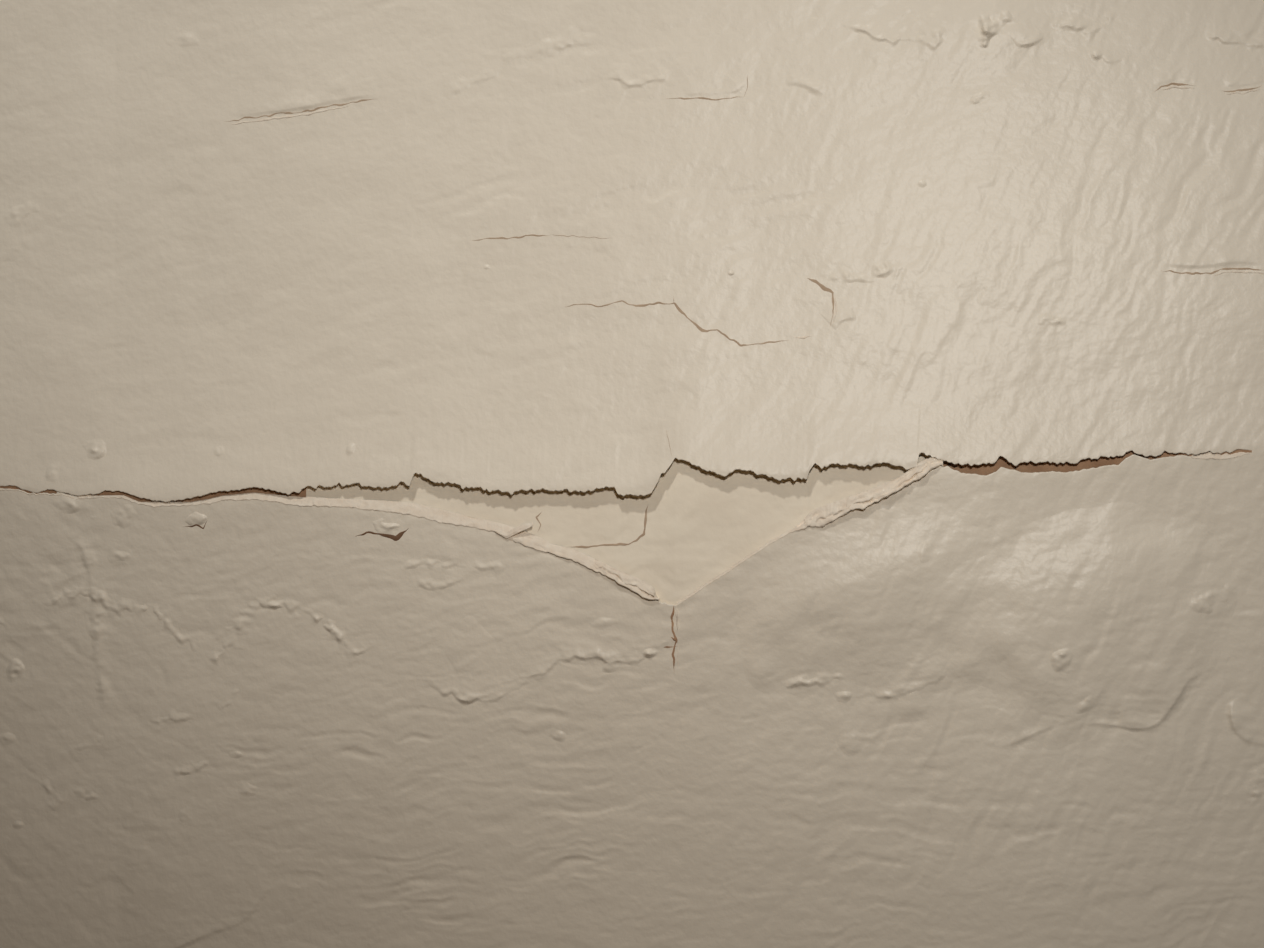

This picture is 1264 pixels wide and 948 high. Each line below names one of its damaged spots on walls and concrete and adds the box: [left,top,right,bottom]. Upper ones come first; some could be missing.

crack [567,278,856,347]
crack [0,434,307,553]
peeling [305,398,943,652]
crack [941,394,1253,521]
crack [664,607,679,667]